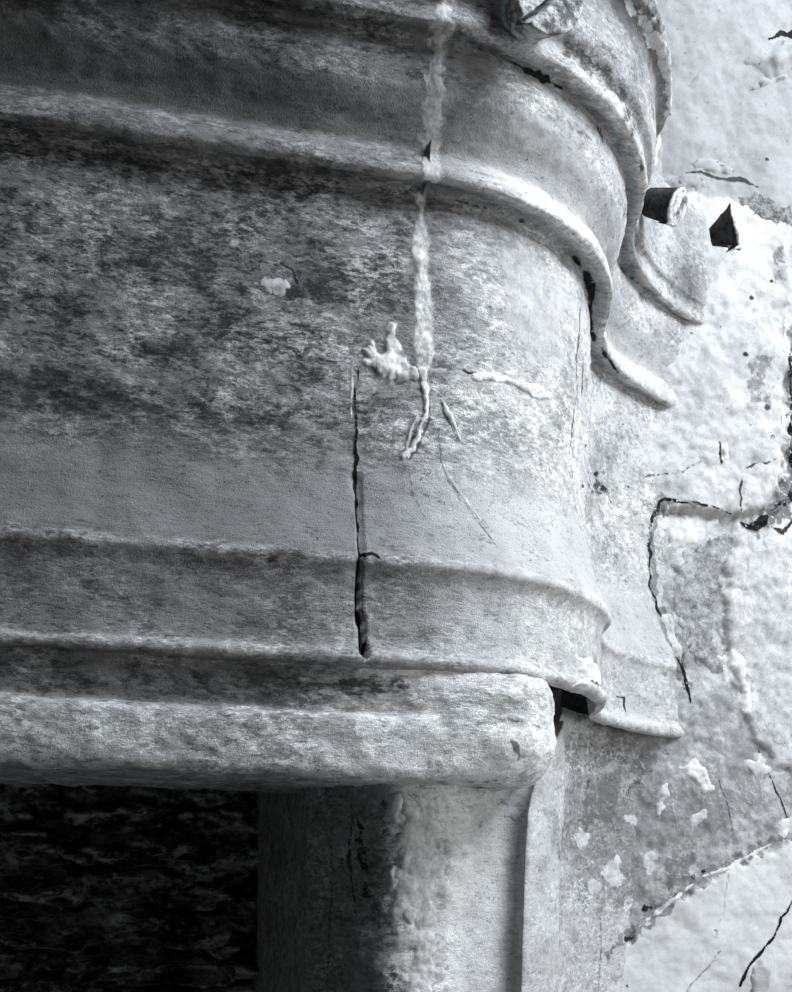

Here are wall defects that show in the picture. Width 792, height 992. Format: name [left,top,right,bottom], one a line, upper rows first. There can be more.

crack [645,293,792,617]
crack [350,369,380,655]
spalling [740,462,773,514]
peeling [660,514,792,746]
crack [678,646,691,703]
peeling [571,827,590,850]
peeling [656,783,670,816]
peeling [679,758,715,794]
peeling [691,809,708,826]
peeling [744,753,771,780]
peeling [587,854,626,896]
spalling [604,815,792,959]